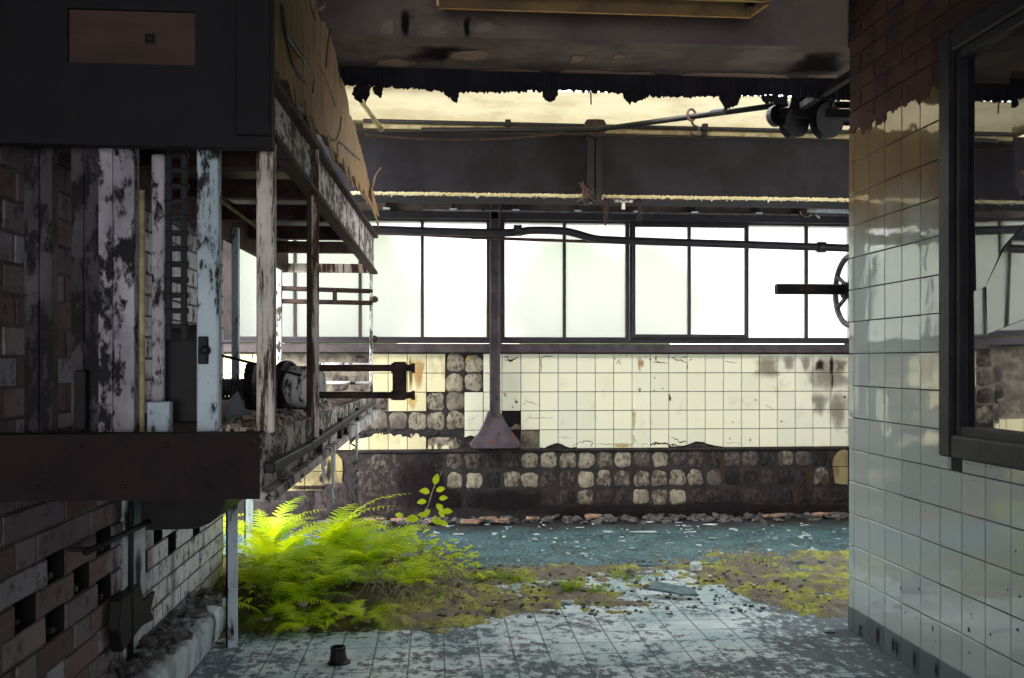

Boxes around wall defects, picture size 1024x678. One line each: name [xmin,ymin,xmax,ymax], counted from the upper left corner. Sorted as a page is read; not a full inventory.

peeling [338,50,852,110]
peeling [848,78,939,135]
rust [409,362,423,385]
damp [816,359,833,388]
crack [524,401,687,448]